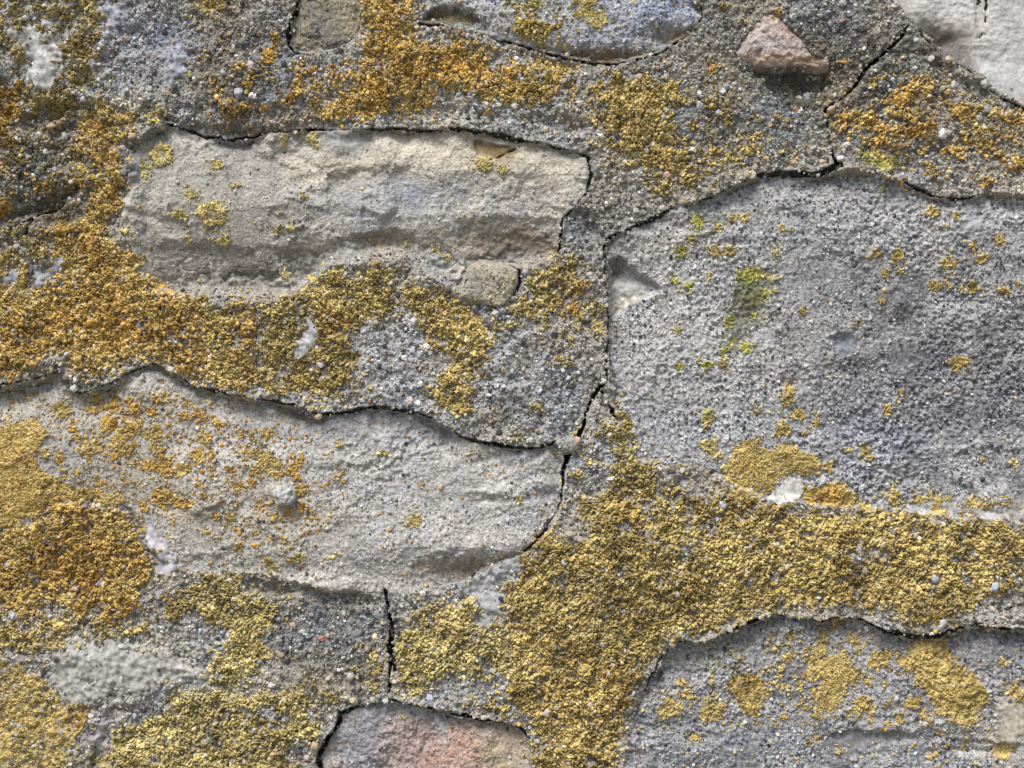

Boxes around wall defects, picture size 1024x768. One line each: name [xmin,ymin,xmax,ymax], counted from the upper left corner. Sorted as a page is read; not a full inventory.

crack [698,26,1024,203]
crack [0,205,674,552]
crack [312,589,529,768]